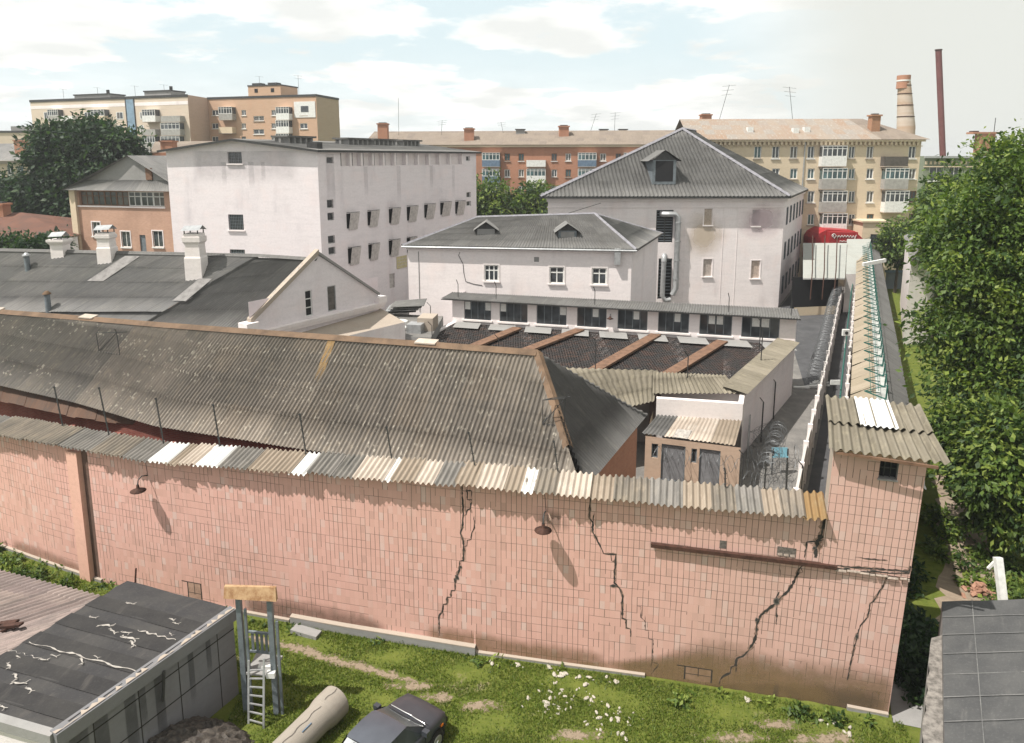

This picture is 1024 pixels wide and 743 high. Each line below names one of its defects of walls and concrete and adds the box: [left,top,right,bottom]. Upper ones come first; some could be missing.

crack [438,485,475,636]
crack [588,498,659,674]
crack [719,519,912,685]